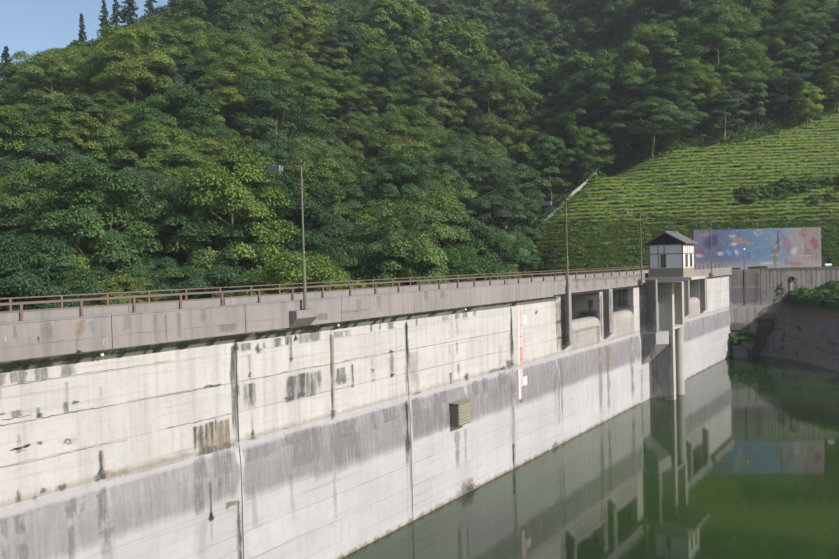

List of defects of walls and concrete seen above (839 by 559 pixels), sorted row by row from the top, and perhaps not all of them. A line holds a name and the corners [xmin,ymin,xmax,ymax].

leakage [0,289,569,520]
leakage [247,282,655,490]
rust [338,402,640,559]